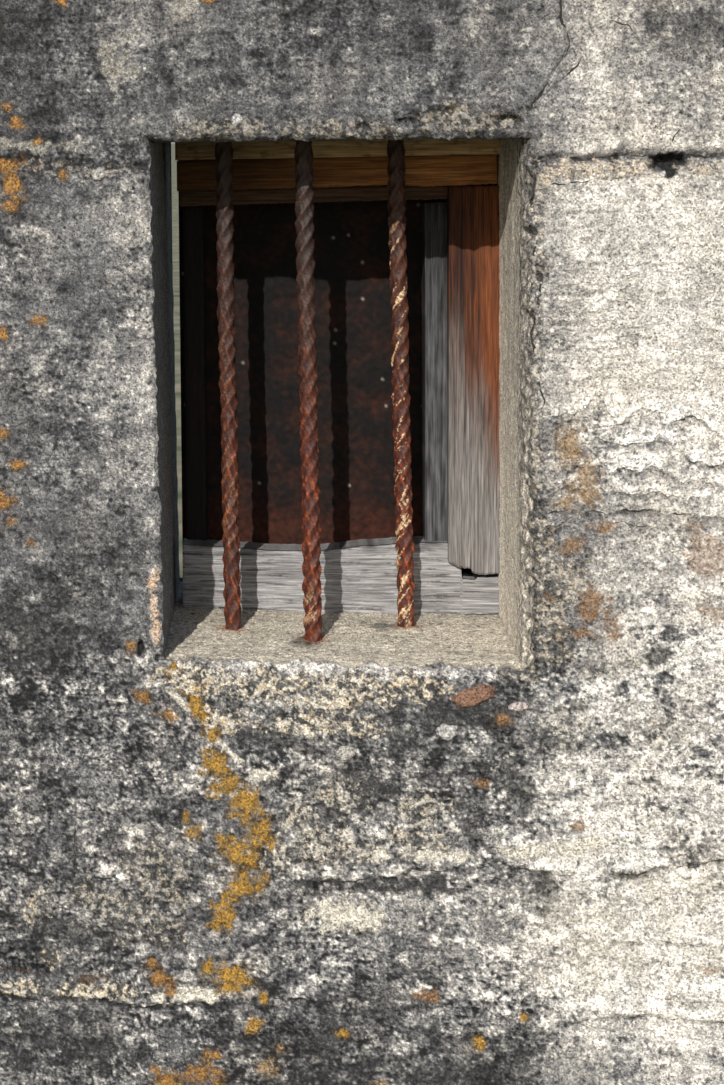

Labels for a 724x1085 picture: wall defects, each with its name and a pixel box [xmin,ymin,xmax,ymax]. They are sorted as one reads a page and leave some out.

crack [357,109,482,128]
spalling [146,152,724,874]
crack [321,864,697,883]
crack [1,992,290,1009]